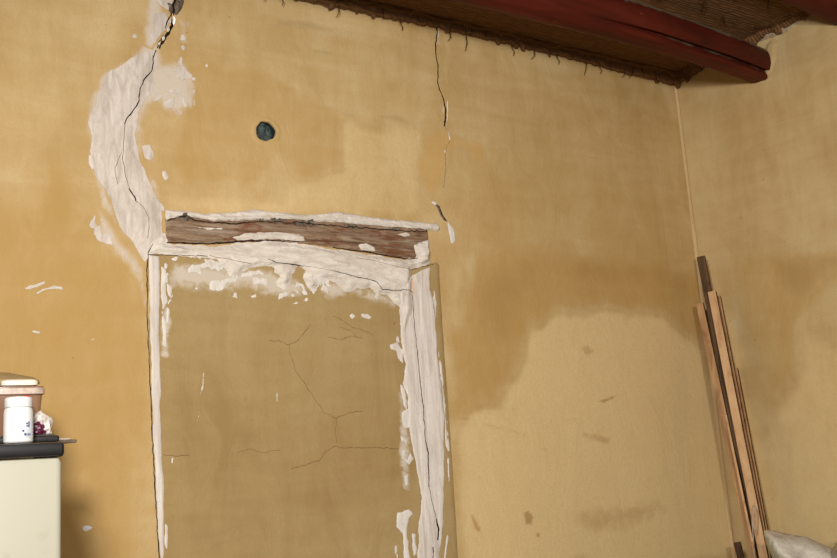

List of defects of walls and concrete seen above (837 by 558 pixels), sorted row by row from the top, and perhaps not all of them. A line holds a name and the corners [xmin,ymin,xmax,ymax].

flaking render [84,0,450,558]
crack [115,0,440,558]
crack [435,28,451,188]